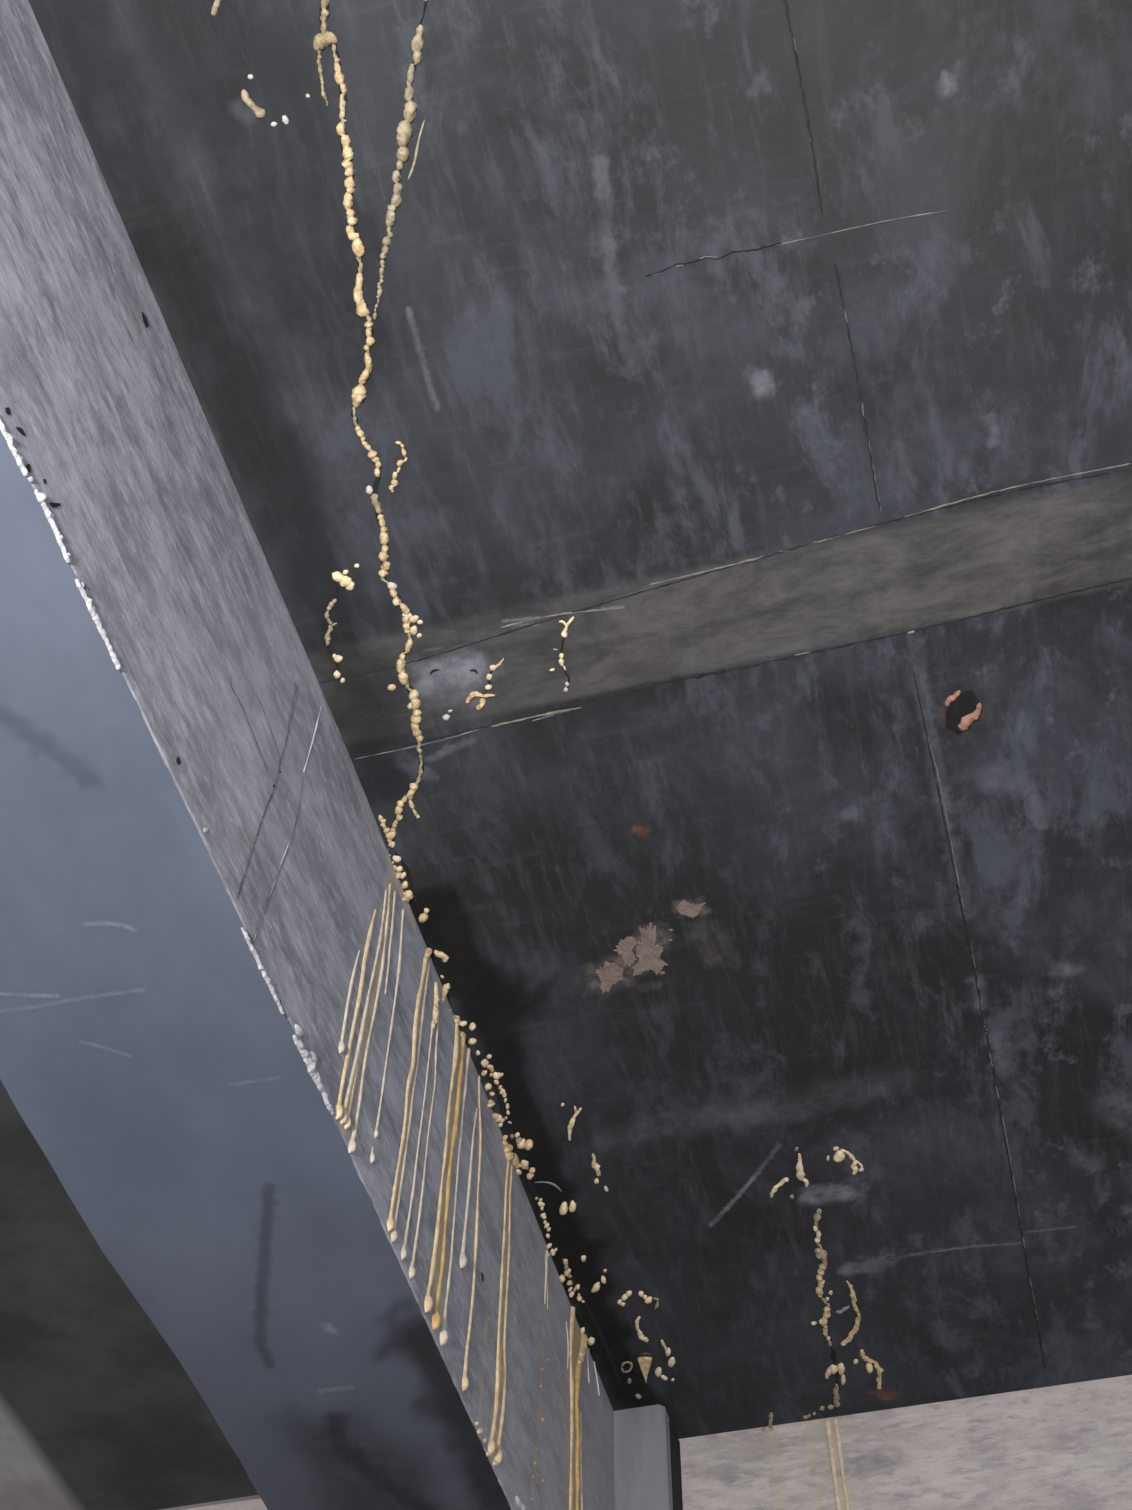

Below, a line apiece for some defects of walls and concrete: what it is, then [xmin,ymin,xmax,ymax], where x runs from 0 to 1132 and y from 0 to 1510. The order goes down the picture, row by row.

crack [229,0,1132,1369]
spalling [937,686,996,735]
leakage [967,753,1061,836]
peeling [567,893,750,1006]
leakage [380,822,659,1406]
leakage [561,1042,934,1192]
leakage [770,1147,875,1211]
leakage [395,1321,511,1510]
crack [635,1316,675,1382]
crack [811,1208,883,1410]